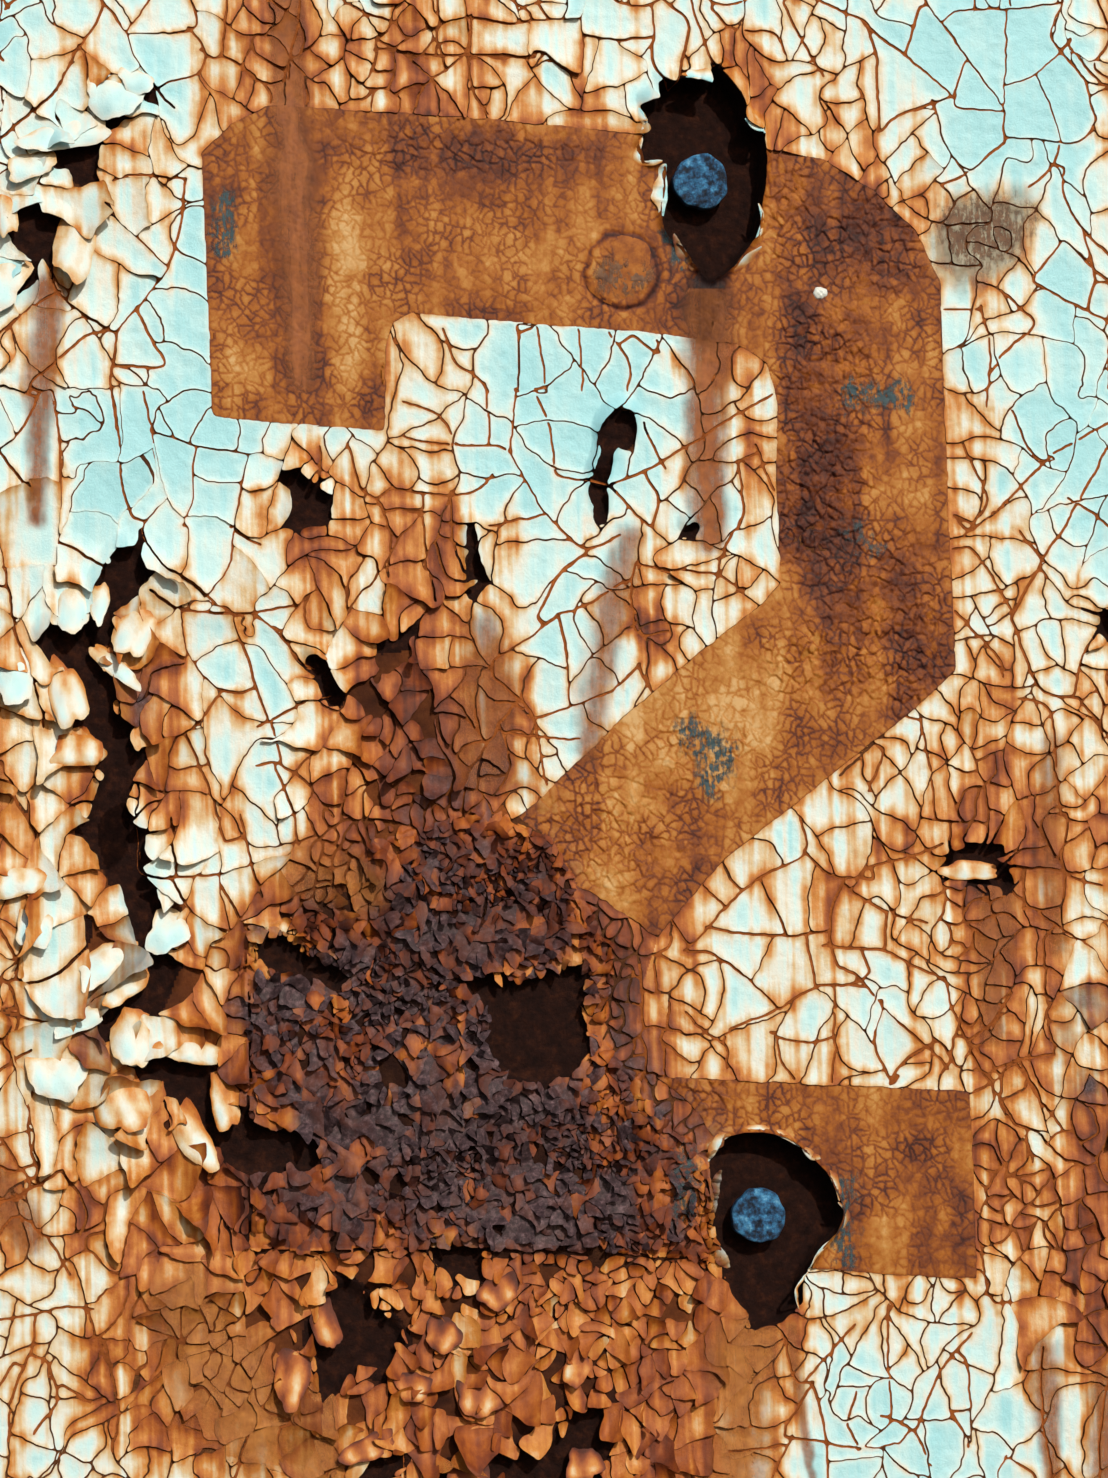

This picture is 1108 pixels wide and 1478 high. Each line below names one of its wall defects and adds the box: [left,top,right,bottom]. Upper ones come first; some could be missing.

peeling [0,36,209,370]
crack [0,0,316,196]
peeling [268,0,767,280]
spalling [580,399,648,531]
crack [0,171,972,1478]
peeling [0,443,843,1478]
corrosion [978,885,1013,1040]
peeling [972,1122,1108,1391]
corrosion [158,1269,289,1463]
corrosion [304,1391,339,1478]
corrosion [1037,1341,1059,1478]
corrosion [1094,1371,1108,1478]